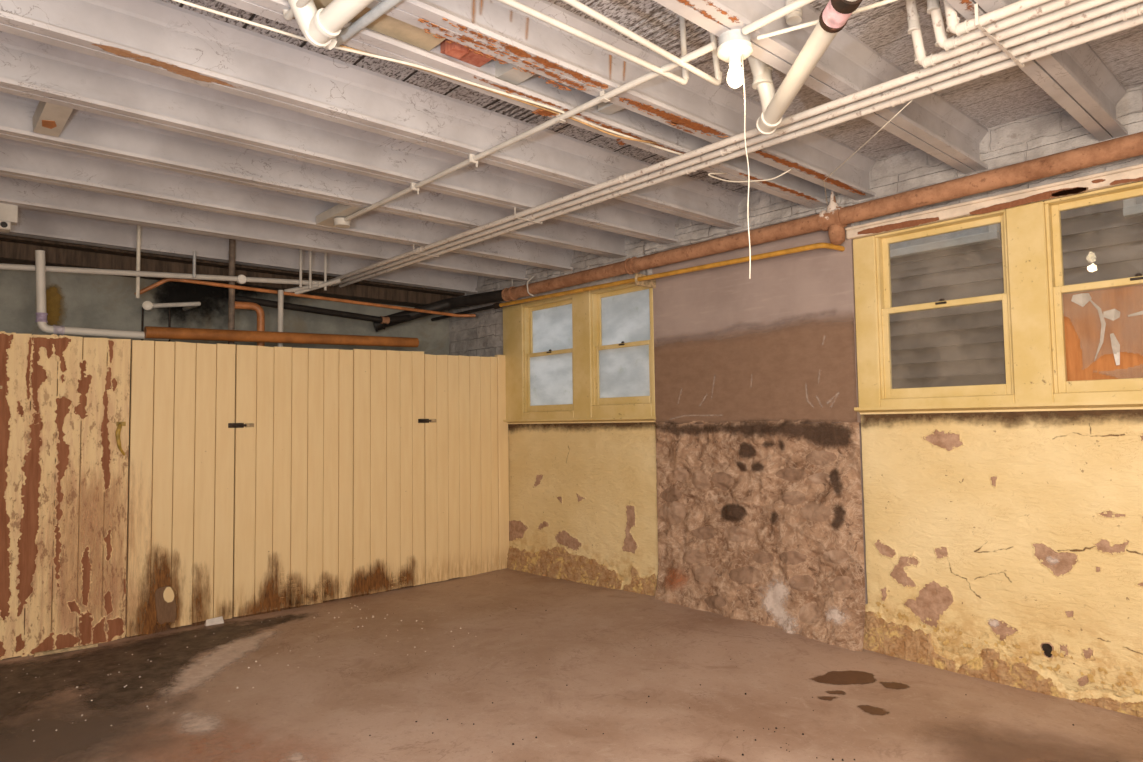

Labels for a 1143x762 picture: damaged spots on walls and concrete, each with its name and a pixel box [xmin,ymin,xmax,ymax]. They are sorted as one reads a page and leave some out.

corrosion [678,0,739,25]
corrosion [92,44,236,88]
corrosion [418,0,625,91]
corrosion [474,76,683,153]
corrosion [619,98,728,138]
corrosion [739,173,818,201]
corrosion [756,151,865,195]
peeling [0,331,127,660]
spalling [507,420,1143,718]
leakage [0,552,415,762]
leakage [812,670,909,701]
leakage [858,705,889,715]